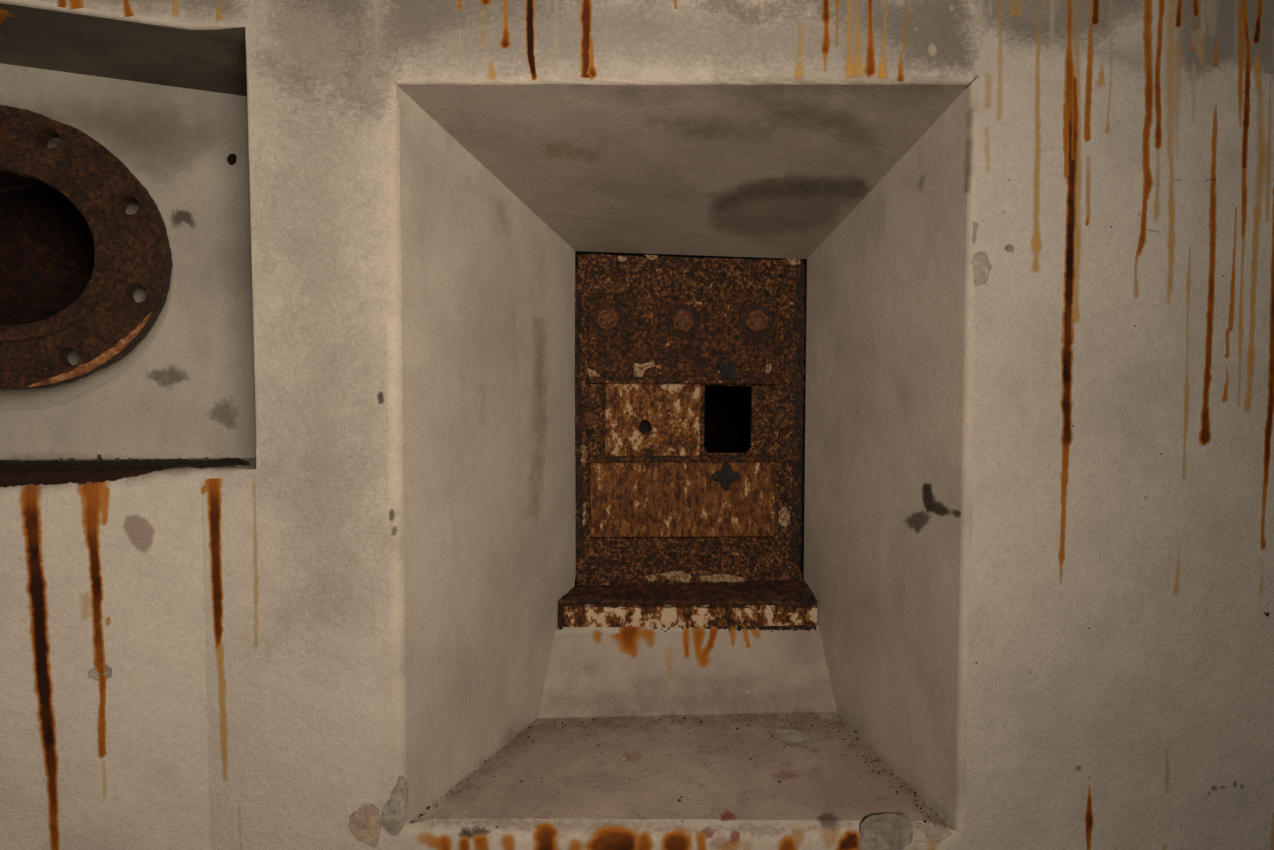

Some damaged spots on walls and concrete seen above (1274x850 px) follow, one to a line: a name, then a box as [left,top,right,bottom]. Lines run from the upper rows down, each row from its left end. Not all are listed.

rust [525,0,537,80]
rust [580,0,597,79]
rust [822,0,904,82]
rust [1136,0,1218,302]
rust [1032,0,1103,577]
rust [1183,0,1274,549]
rust [0,455,248,850]
flaking render [349,775,408,847]
rust [420,835,514,850]
rust [534,823,706,850]
rust [836,831,860,850]
flaking render [859,812,951,850]